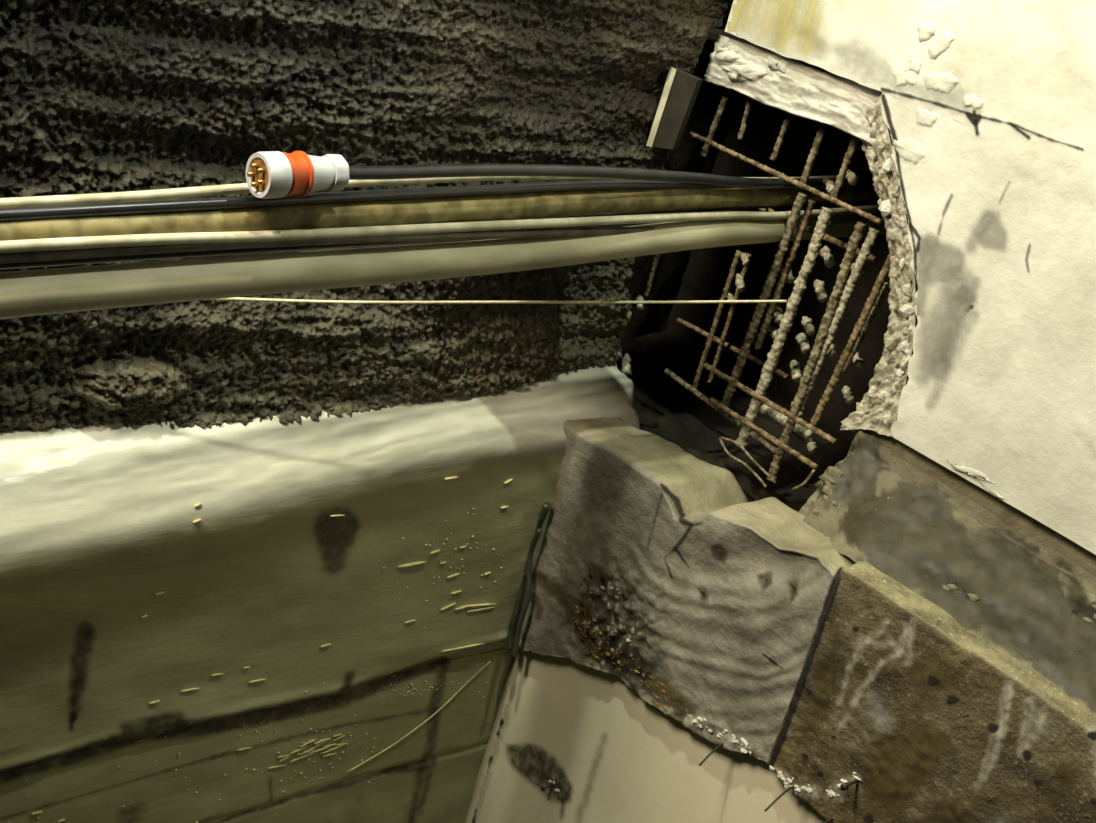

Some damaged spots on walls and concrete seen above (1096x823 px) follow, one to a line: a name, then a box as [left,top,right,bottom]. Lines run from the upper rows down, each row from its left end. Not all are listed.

flaking render [916,106,939,127]
crack [881,88,1083,282]
spalling [626,254,660,323]
spalling [664,34,926,514]
leakage [914,215,1005,381]
leakage [316,509,358,570]
leakage [70,626,94,730]
corrosion [531,572,694,716]